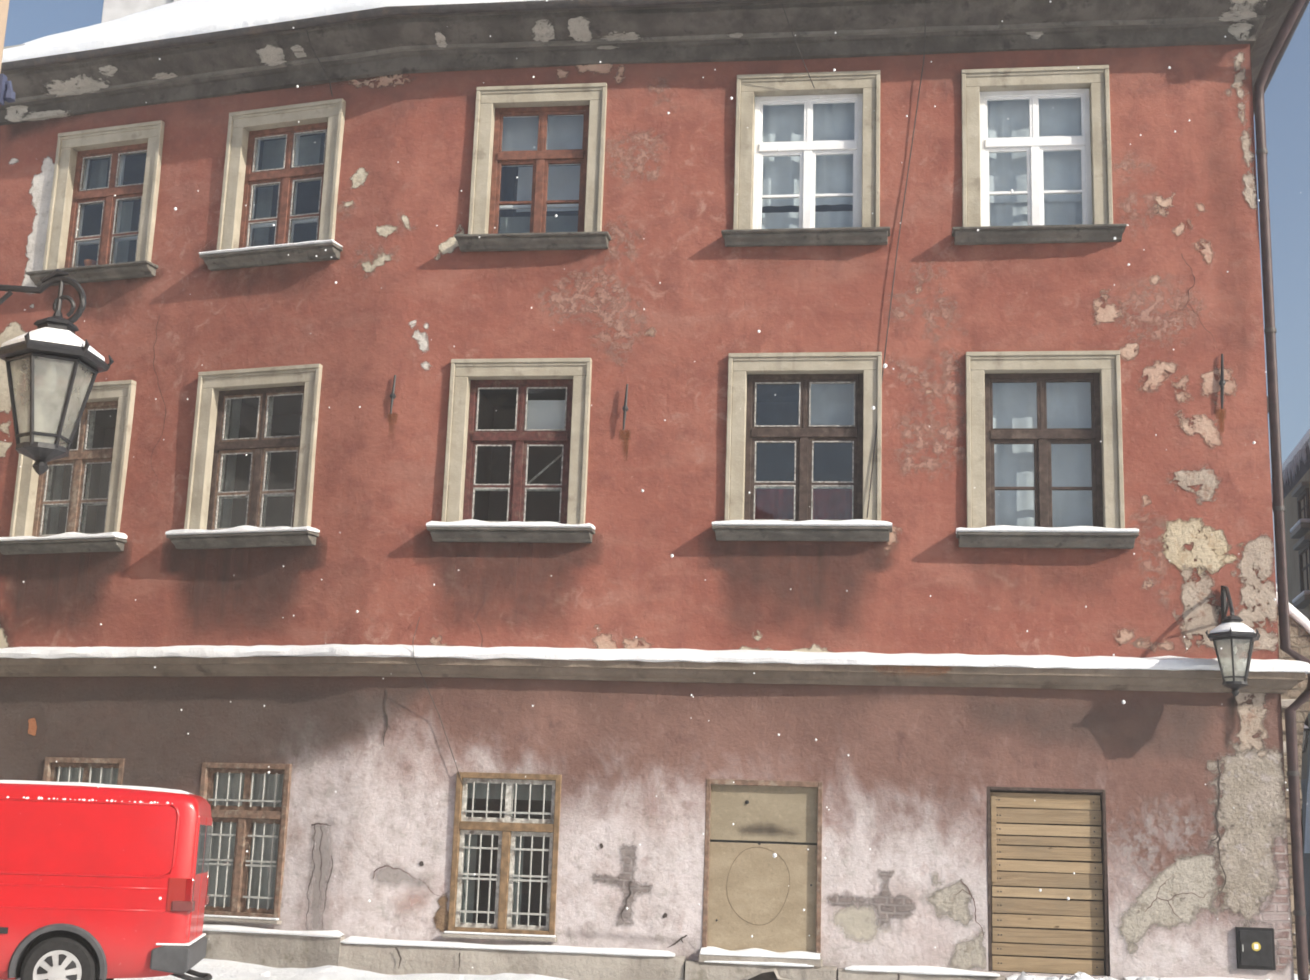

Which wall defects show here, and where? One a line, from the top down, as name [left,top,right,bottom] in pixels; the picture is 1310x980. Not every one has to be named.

flaking render [1218,0,1268,209]
flaking render [22,157,55,308]
peeling [336,167,368,211]
peeling [357,215,410,276]
peeling [435,225,464,260]
flaking render [0,322,26,457]
peeling [1093,275,1237,449]
flaking render [1113,467,1278,653]
flaking render [0,628,8,649]
crack [1145,759,1226,922]
flaking render [1120,693,1293,972]
flaking render [949,931,986,970]